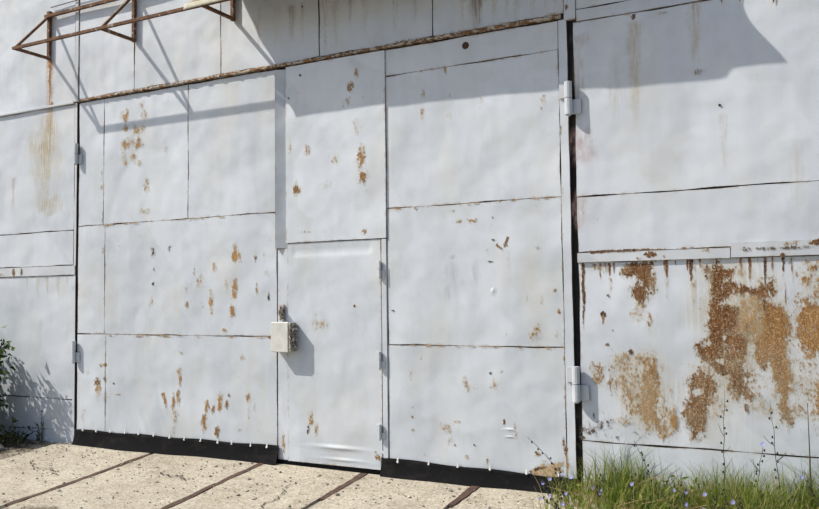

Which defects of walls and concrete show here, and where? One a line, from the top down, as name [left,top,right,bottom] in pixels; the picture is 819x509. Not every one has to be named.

rust [120,103,147,166]
rust [357,146,366,184]
rust [225,278,237,316]
rust [580,238,819,444]
rust [161,368,181,433]
rust [200,393,229,438]